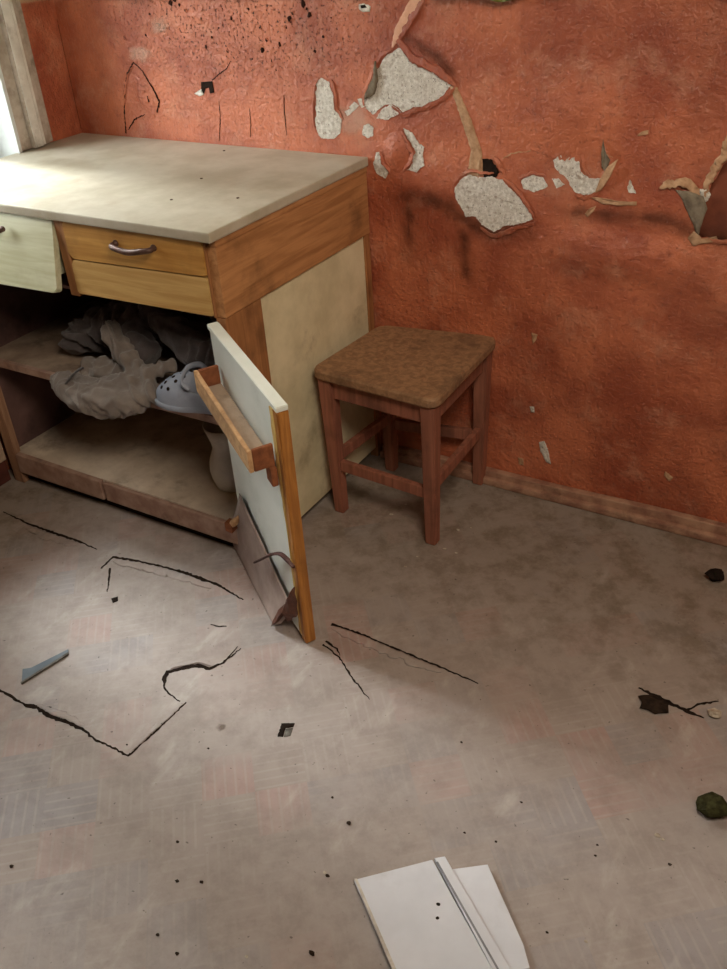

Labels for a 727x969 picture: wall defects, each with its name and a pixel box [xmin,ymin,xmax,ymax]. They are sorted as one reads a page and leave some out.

crack [122,62,160,133]
flaking render [311,39,456,172]
flaking render [373,152,391,178]
flaking render [452,151,602,239]
peeling [659,136,727,245]
crack [3,511,244,600]
crack [0,624,241,756]
crack [322,623,478,700]